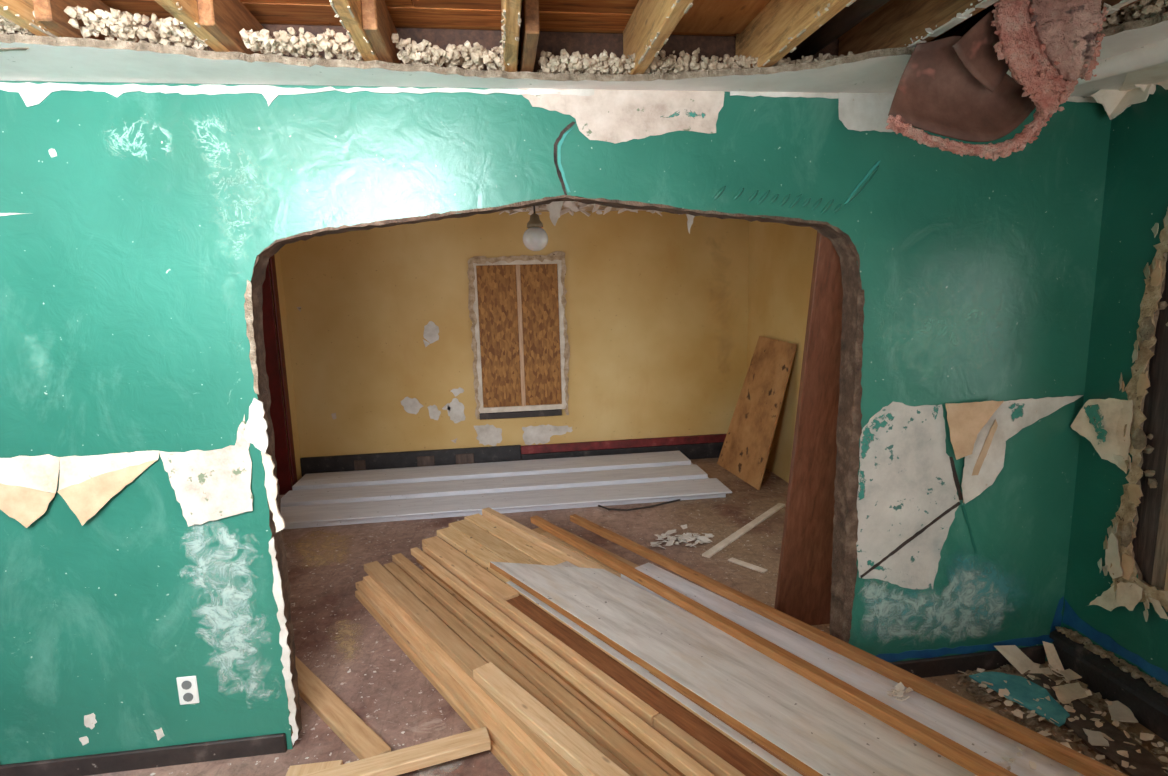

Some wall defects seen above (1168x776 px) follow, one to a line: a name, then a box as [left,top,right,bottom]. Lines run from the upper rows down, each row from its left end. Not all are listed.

peeling [109,120,170,157]
peeling [194,119,263,259]
peeling [0,82,895,144]
peeling [1067,38,1168,120]
flaking render [244,195,1016,745]
spalling [1070,208,1168,622]
peeling [183,526,270,697]
spalling [79,713,97,745]